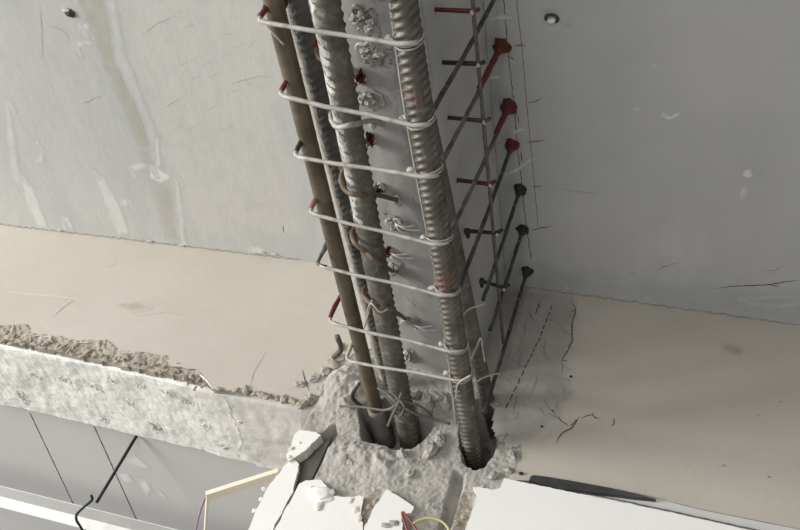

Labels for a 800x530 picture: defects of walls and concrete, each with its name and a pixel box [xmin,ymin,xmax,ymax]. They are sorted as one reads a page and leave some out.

leakage [73,0,198,242]
spalling [232,0,584,530]
crack [714,267,800,289]
spalling [0,324,222,393]
spalling [156,387,199,408]
spalling [147,421,168,437]
crack [556,413,614,443]